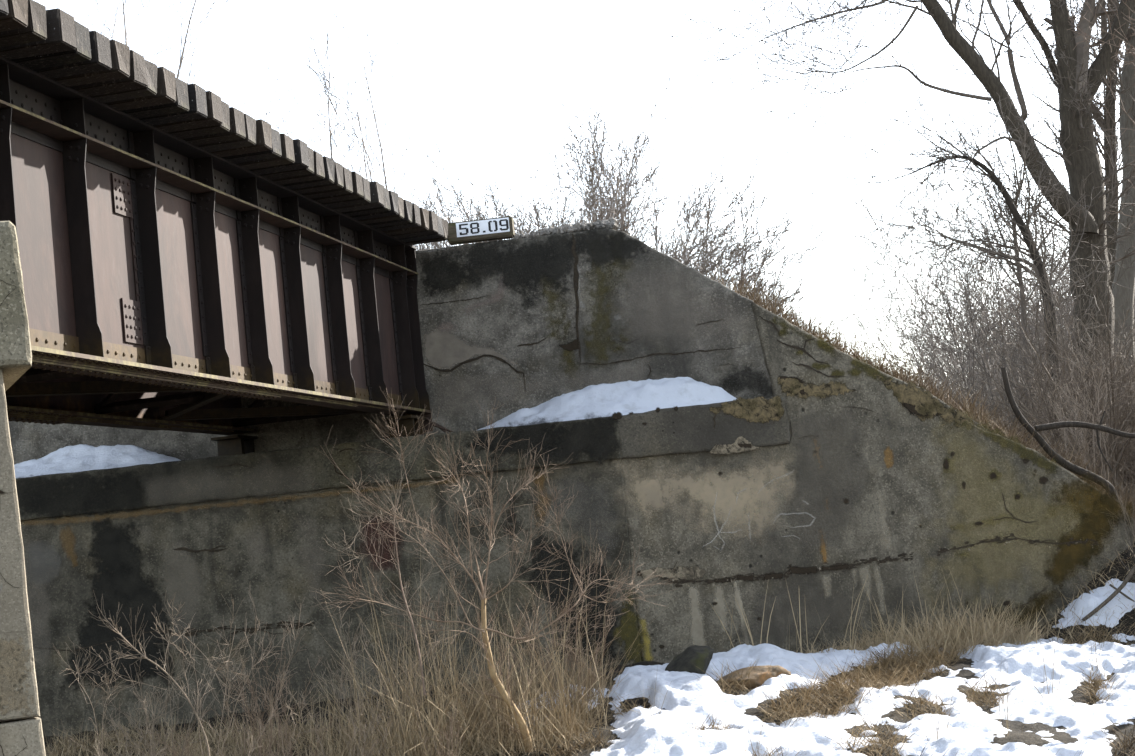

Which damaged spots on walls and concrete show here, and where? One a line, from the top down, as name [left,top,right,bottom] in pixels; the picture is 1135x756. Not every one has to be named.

crack [422,296,485,305]
water stain [422,224,645,316]
crack [571,233,740,378]
crack [424,338,546,394]
crack [759,316,846,377]